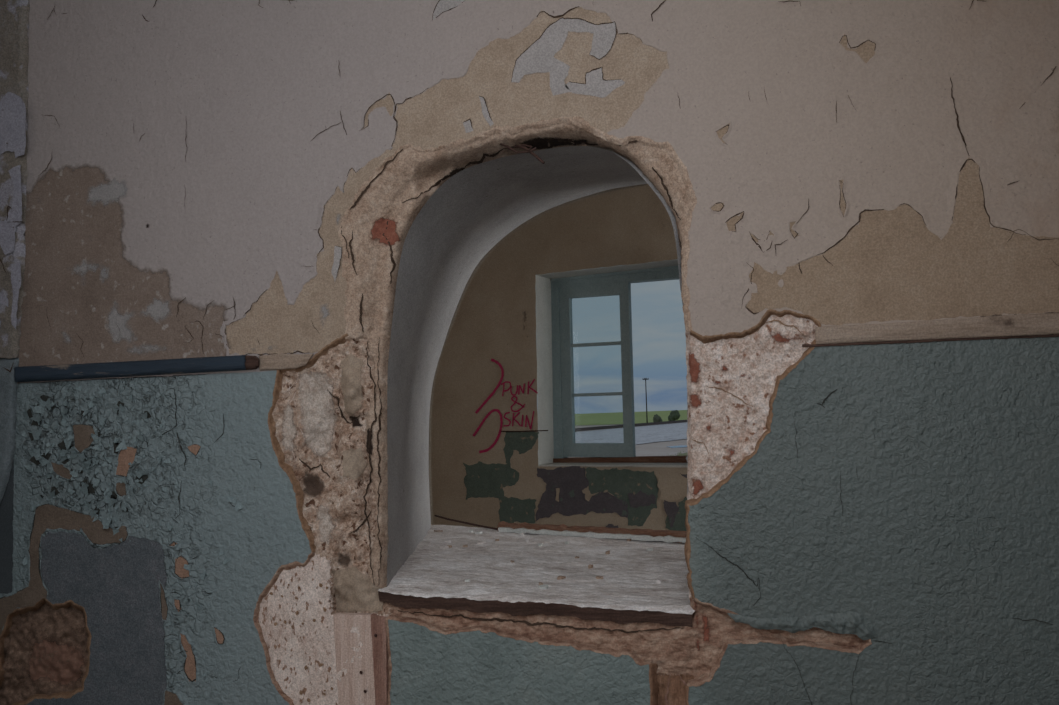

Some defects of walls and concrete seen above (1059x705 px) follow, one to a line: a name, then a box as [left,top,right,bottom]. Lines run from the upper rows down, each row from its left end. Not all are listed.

peeling [0,0,697,705]
peeling [463,152,1059,687]
crack [950,77,969,155]